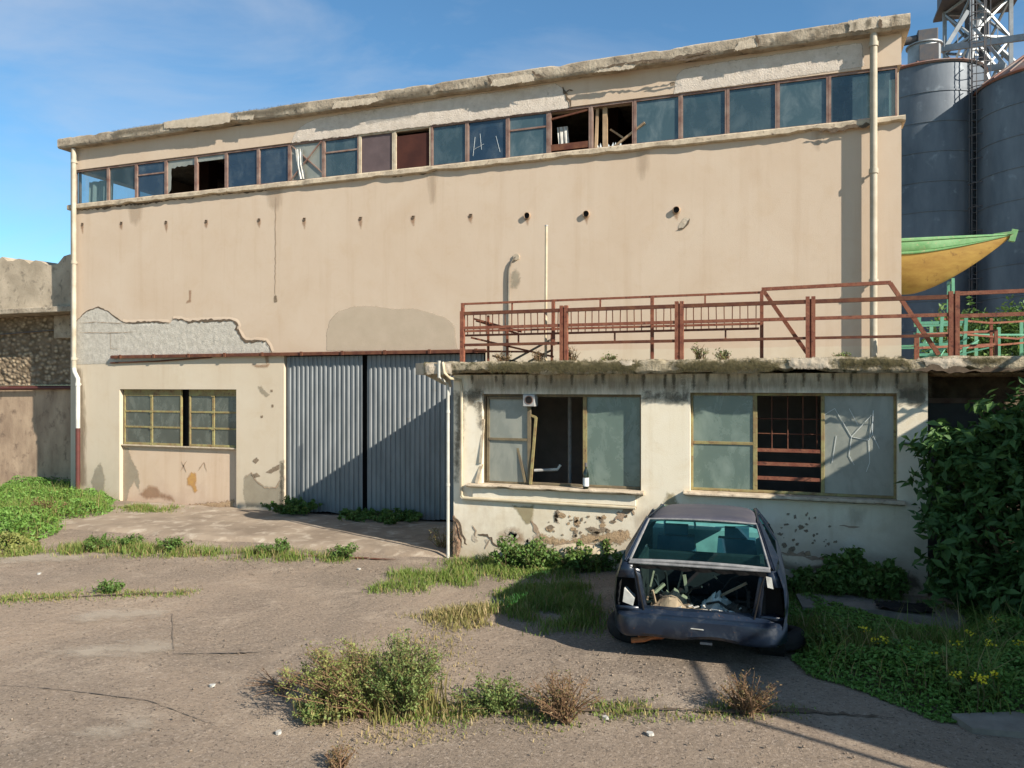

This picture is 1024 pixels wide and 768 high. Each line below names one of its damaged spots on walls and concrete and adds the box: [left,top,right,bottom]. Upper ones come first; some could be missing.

flaking render [76,306,274,365]
damp [644,374,709,403]
damp [896,374,925,405]
damp [181,461,207,492]
flaking render [194,458,282,507]
peeling [453,507,631,558]
peeling [777,512,837,553]